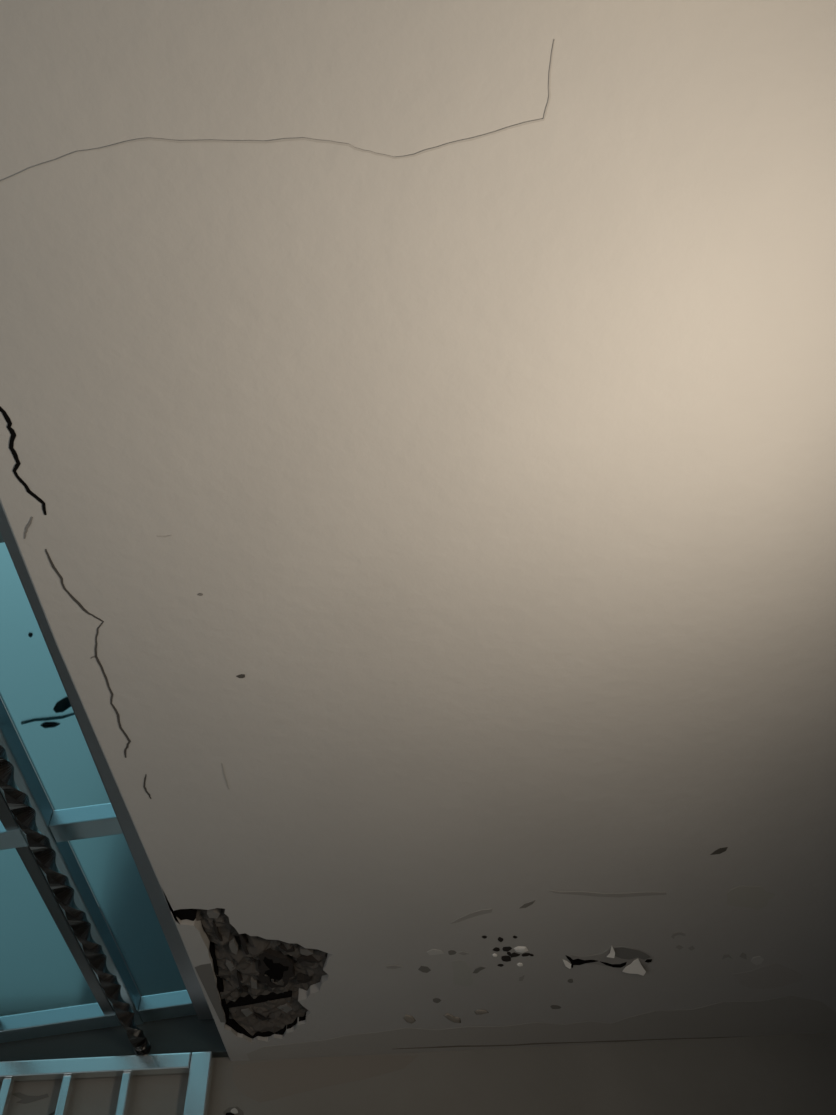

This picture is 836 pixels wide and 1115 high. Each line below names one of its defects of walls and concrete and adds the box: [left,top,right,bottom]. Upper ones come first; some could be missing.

crack [0,40,555,182]
crack [0,407,151,799]
spalling [174,908,328,1038]
peeling [473,936,534,973]
peeling [562,946,654,983]